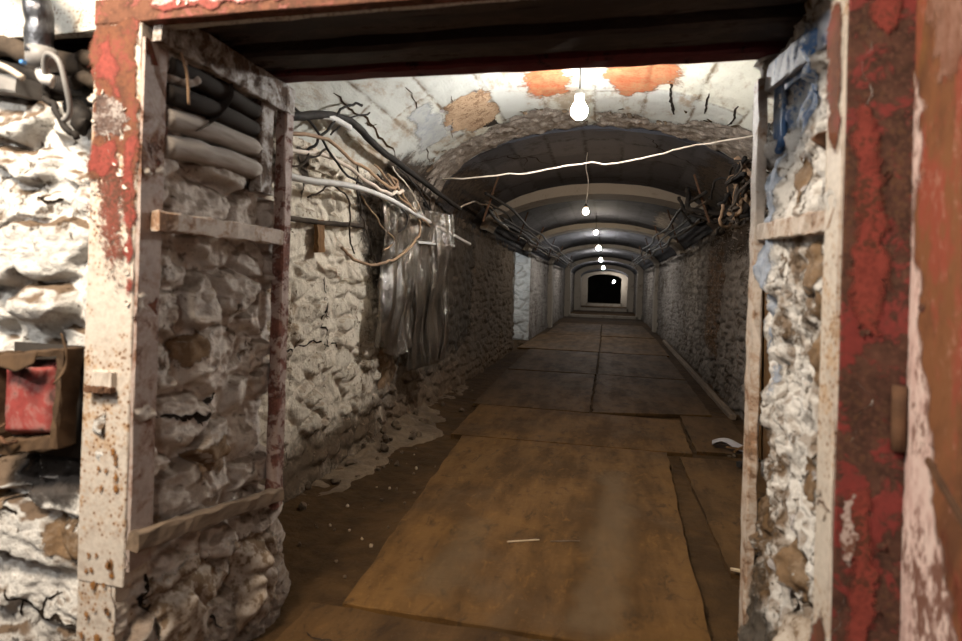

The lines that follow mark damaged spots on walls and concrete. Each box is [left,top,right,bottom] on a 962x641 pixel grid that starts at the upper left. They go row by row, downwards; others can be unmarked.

peeling [150,0,262,11]
peeling [84,36,137,306]
spalling [413,89,753,210]
peeling [846,100,891,337]
peeling [900,73,956,641]
crack [156,392,215,426]
rust [97,447,118,493]
rust [84,553,114,590]
peeling [839,487,885,641]
crack [3,589,75,628]
rust [78,607,109,641]
crack [136,573,162,641]